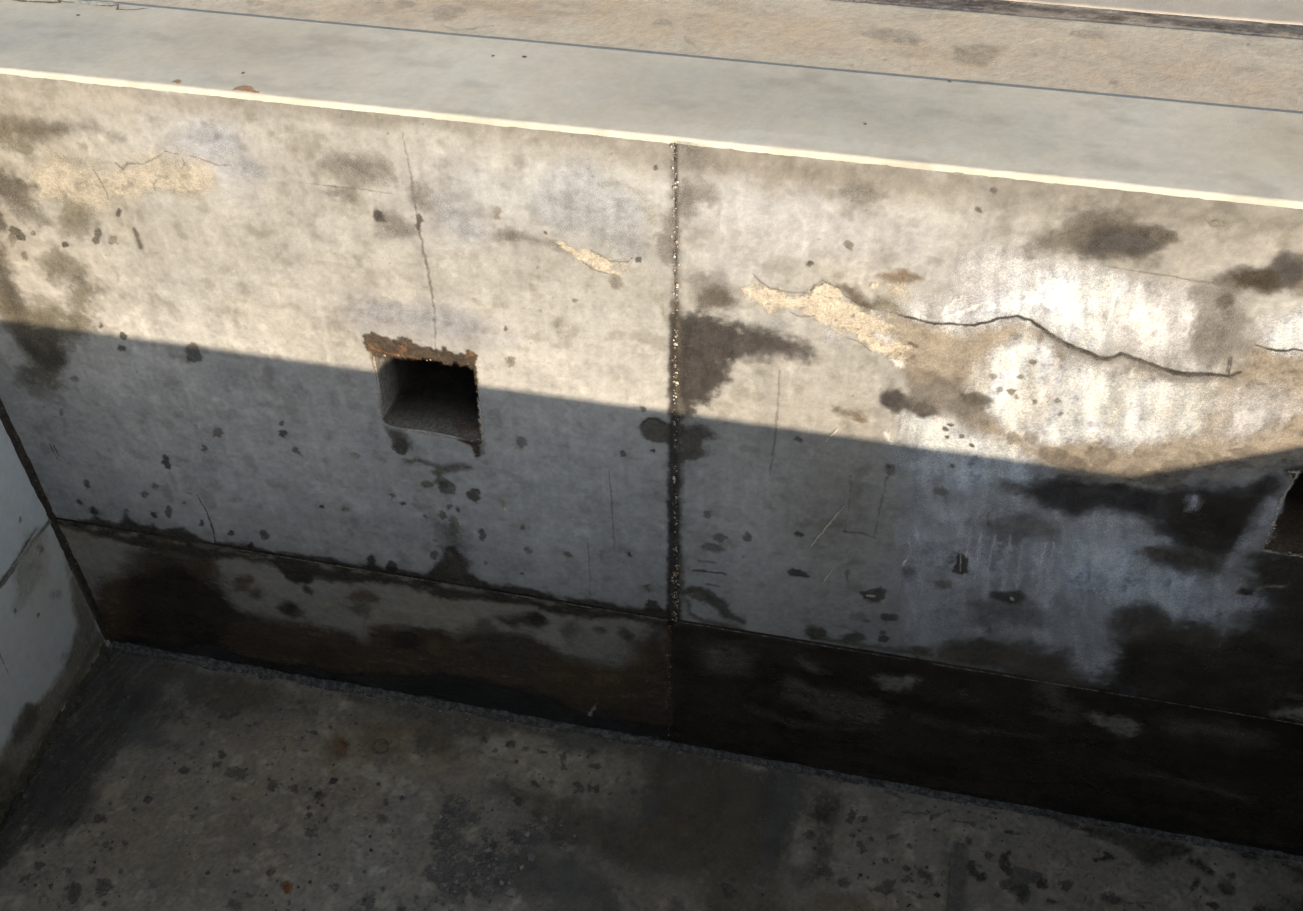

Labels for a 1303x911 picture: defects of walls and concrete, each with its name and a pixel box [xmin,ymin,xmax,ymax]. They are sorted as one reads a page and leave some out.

water stain [0,121,103,154]
spalling [559,242,628,275]
crack [823,280,1303,378]
peeling [744,283,1303,557]
water stain [0,147,1303,875]